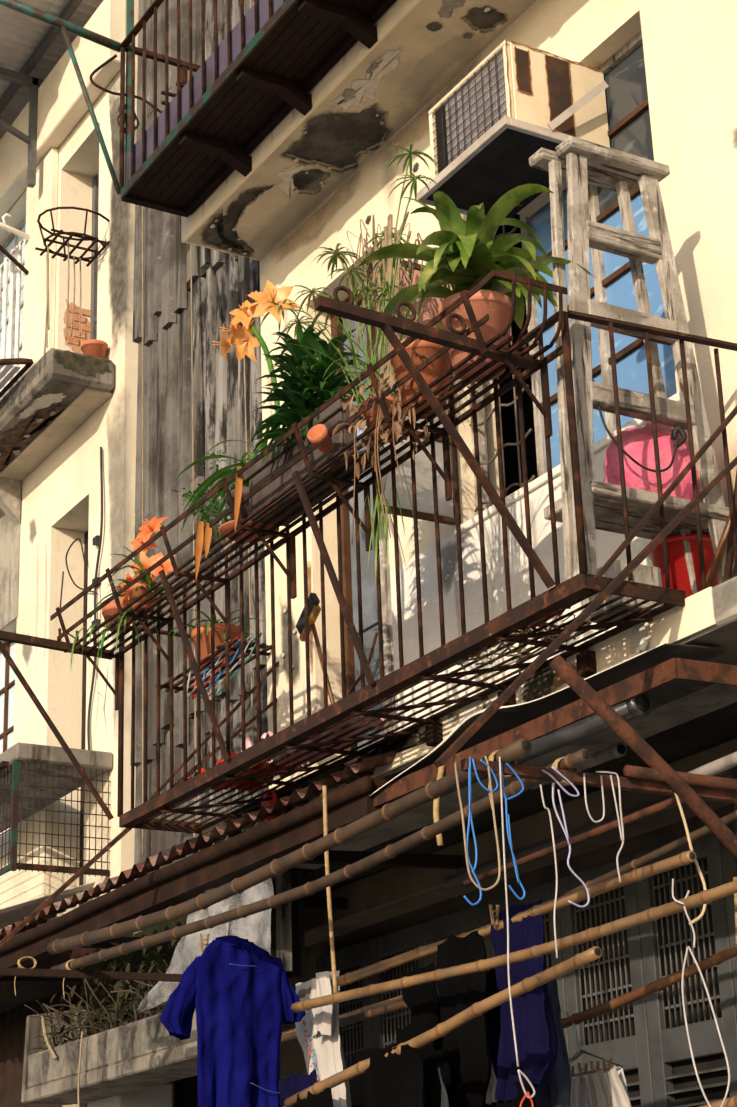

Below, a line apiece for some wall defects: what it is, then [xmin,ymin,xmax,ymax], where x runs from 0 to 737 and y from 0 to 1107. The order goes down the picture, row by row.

spalling [426,0,507,39]
spalling [203,48,403,257]
spalling [0,403,67,471]